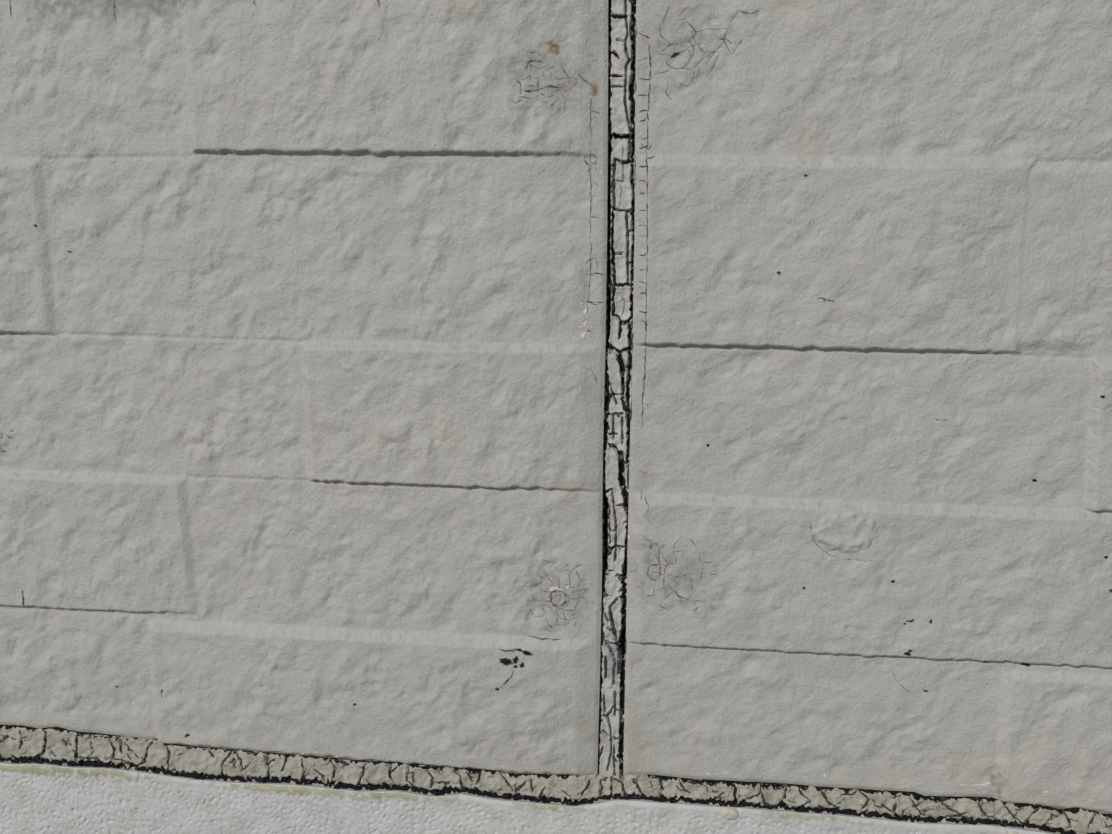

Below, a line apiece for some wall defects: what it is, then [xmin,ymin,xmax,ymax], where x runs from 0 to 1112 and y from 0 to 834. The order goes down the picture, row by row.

crack [660,7,754,85]
crack [518,52,595,130]
crack [584,155,597,226]
crack [598,0,636,776]
crack [530,560,585,640]
crack [646,539,699,612]